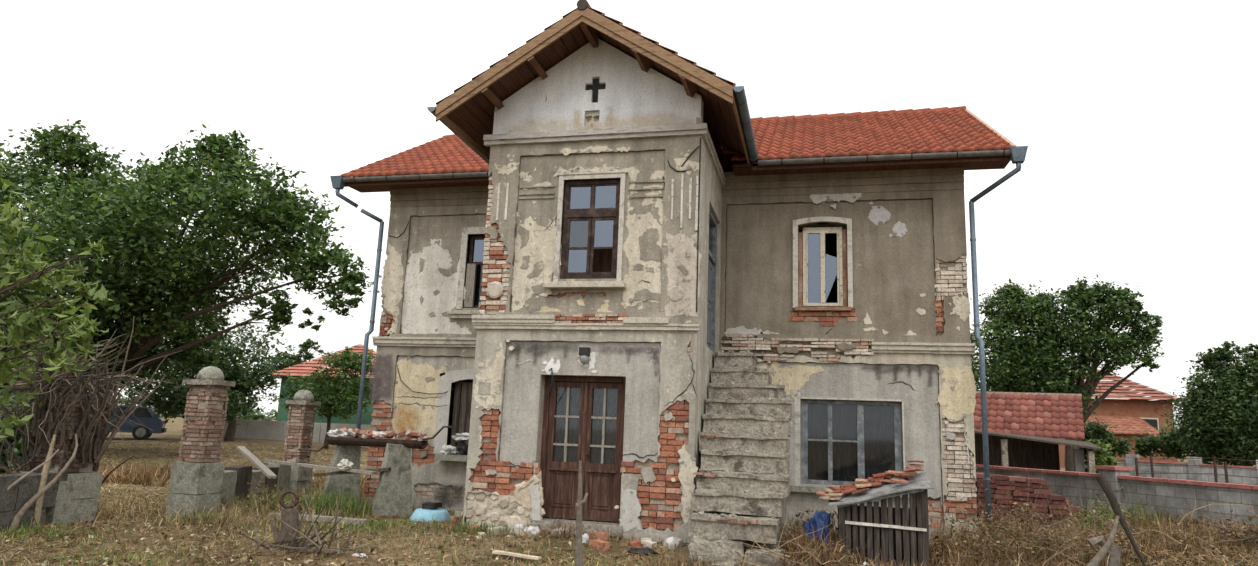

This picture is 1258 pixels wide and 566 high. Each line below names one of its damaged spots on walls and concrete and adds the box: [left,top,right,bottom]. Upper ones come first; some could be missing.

peeling [377,140,702,337]
spalling [720,307,889,399]
peeling [810,186,908,237]
spalling [916,255,972,332]
peeling [363,356,445,499]
spalling [415,339,546,528]
spalling [614,399,721,532]
peeling [928,364,977,528]